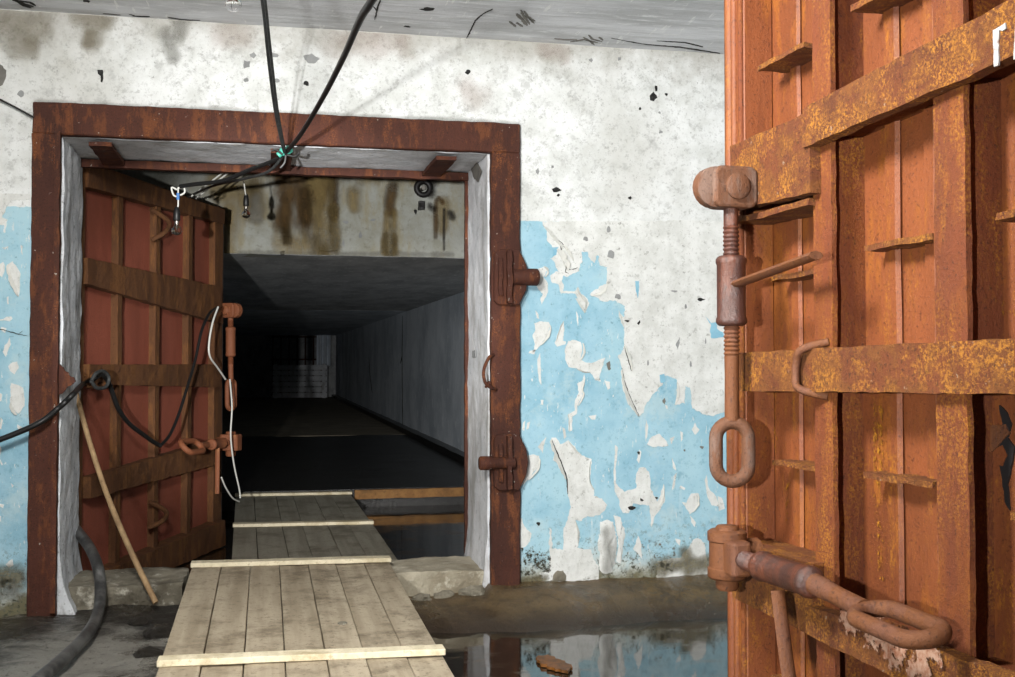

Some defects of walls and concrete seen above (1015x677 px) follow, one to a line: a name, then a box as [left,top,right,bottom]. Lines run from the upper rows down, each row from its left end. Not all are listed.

water stain [209,175,262,253]
rust [274,165,340,254]
rust [381,182,397,256]
rust [434,197,447,249]
peeling [0,261,21,304]
peeling [0,316,25,429]
peeling [520,220,725,582]
mould [520,548,551,582]
water stain [652,548,709,575]
peeling [838,610,943,677]